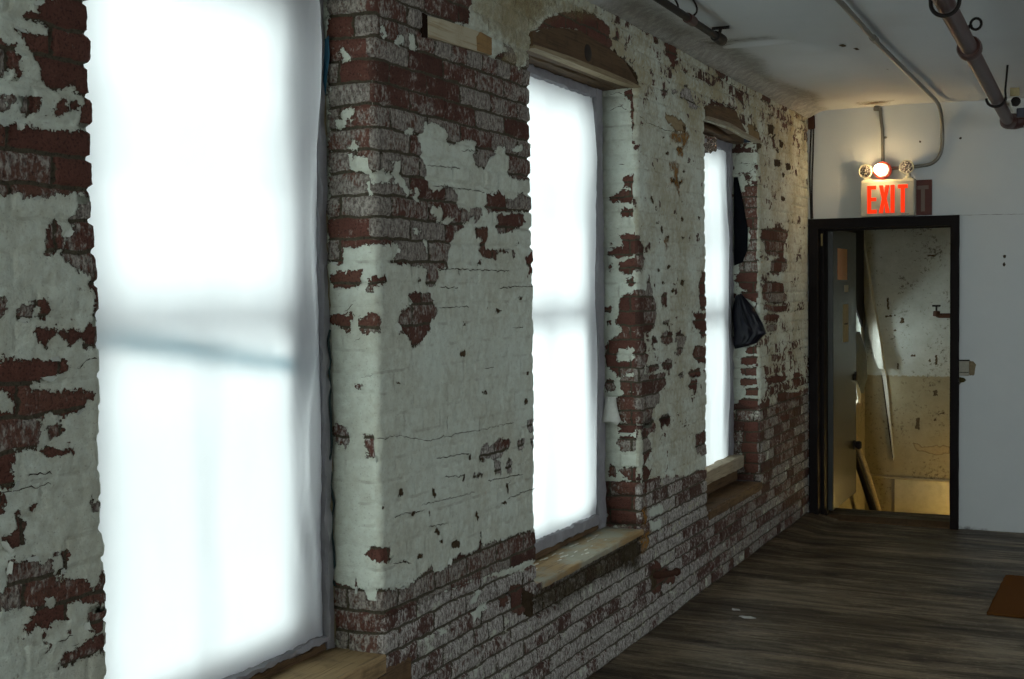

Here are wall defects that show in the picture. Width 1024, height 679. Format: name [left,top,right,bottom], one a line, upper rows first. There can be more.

peeling [326,0,533,348]
peeling [609,173,634,218]
peeling [734,184,789,332]
spalling [747,122,791,177]
peeling [0,0,107,670]
crack [378,417,534,527]
peeling [604,232,707,524]
peeling [739,345,801,474]
peeling [334,511,536,654]
spalling [649,559,676,595]